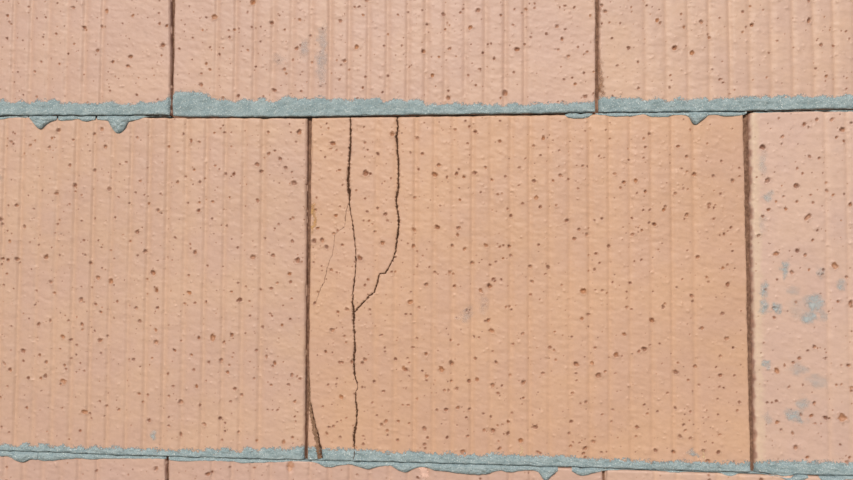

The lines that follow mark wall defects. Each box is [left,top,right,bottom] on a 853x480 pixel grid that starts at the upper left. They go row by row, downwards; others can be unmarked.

crack [308,371,323,459]
crack [316,117,400,459]